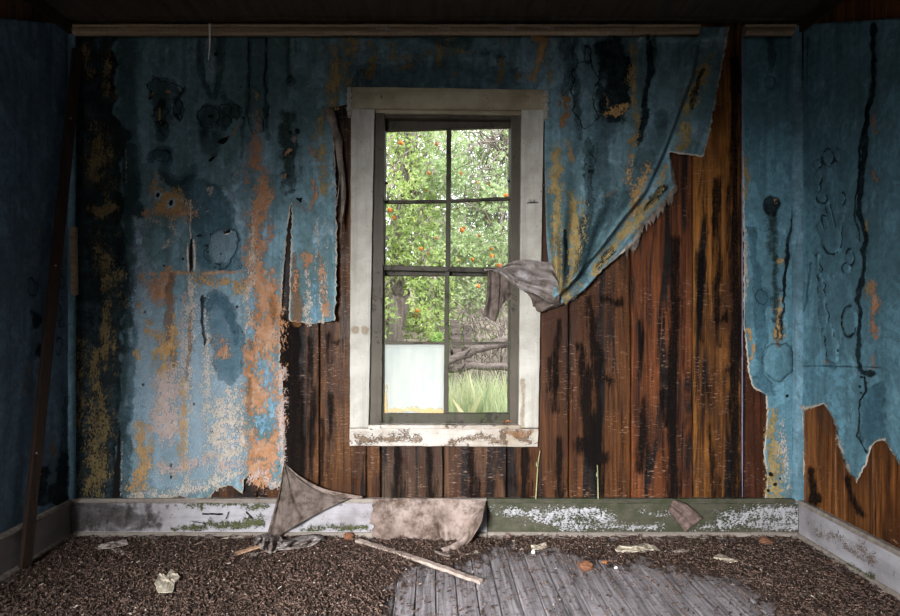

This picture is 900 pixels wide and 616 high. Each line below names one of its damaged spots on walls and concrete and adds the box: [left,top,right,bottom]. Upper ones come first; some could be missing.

damp [196,37,300,195]
peeling [302,114,331,327]
peeling [353,429,422,445]
peeling [448,431,537,445]
damp [555,437,568,498]
damp [576,296,623,498]
damp [559,35,656,145]
peeling [545,36,670,305]
damp [658,235,682,498]
peeling [674,53,717,152]
damp [694,251,706,343]
damp [853,22,880,453]